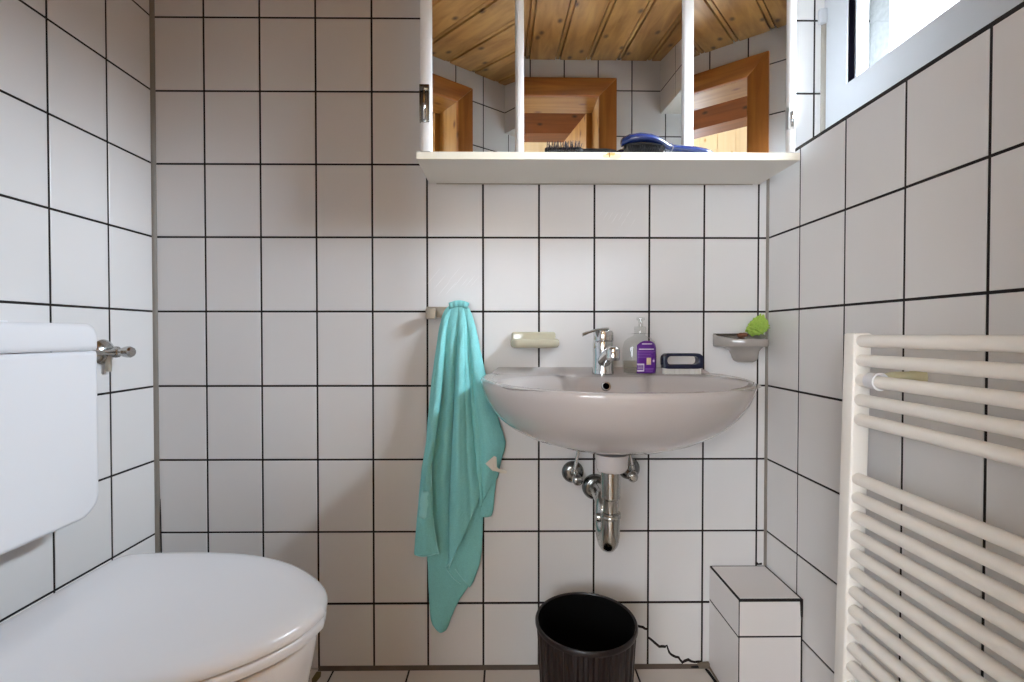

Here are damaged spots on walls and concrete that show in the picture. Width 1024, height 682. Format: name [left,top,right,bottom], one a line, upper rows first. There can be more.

crack [638,625,702,664]